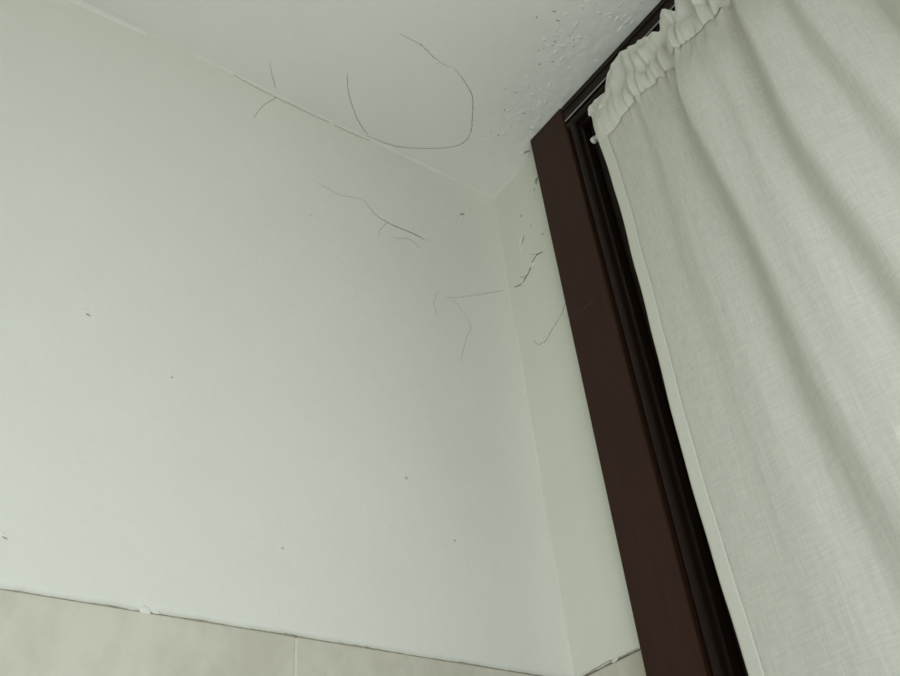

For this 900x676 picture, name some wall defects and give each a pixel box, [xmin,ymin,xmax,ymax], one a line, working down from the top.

crack [234,34,473,149]
crack [433,252,542,361]